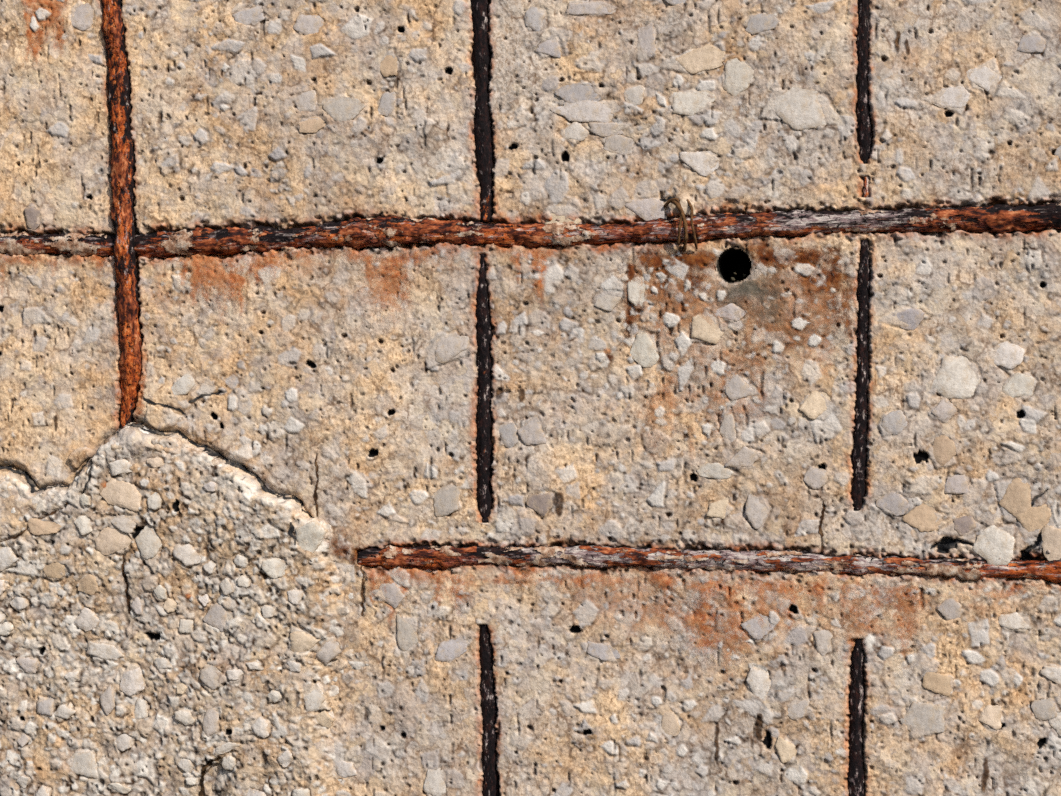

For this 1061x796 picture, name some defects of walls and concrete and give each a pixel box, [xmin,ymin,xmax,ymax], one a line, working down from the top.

corrosion [175,250,309,302]
corrosion [626,248,716,324]
corrosion [747,241,851,328]
corrosion [767,314,803,346]
spalling [0,404,370,796]
corrosion [685,581,743,647]
crack [198,757,221,796]